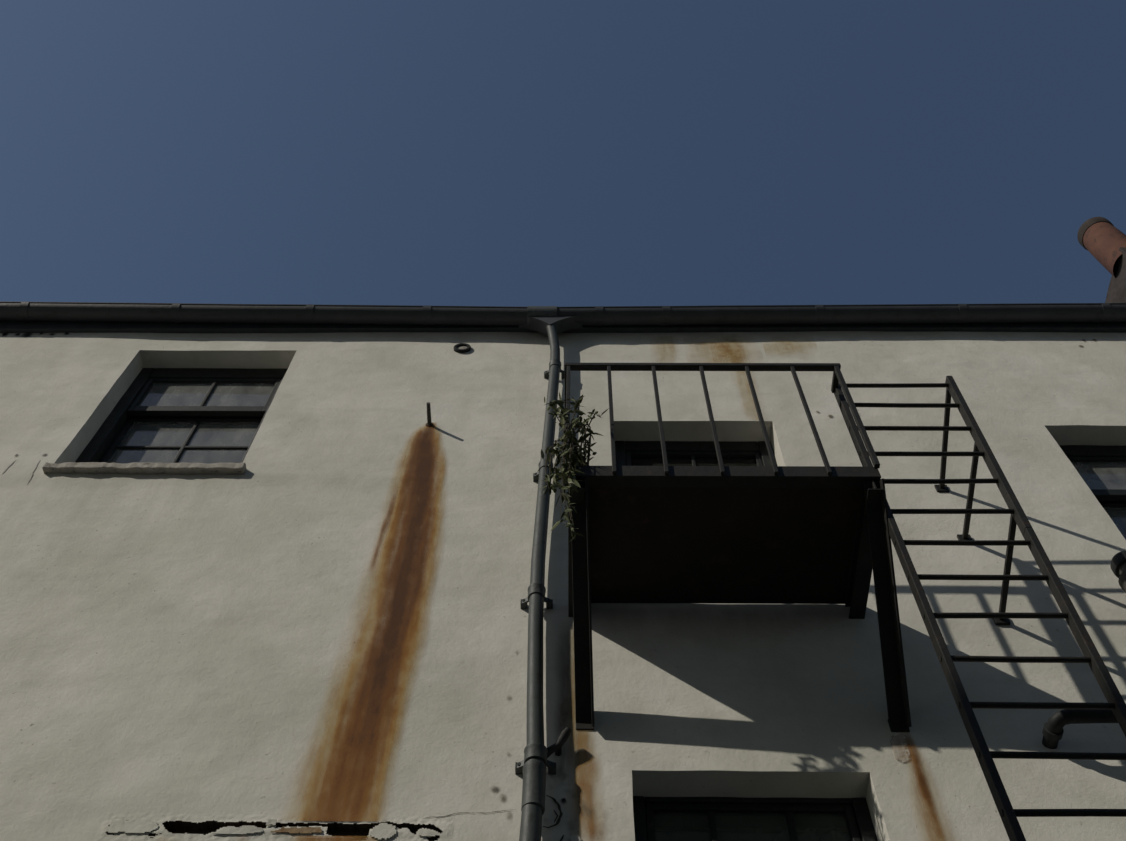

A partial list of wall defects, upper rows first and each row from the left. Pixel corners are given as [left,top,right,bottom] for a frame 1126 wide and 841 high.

rust [298,422,444,821]
crack [94,809,516,841]
rust [576,733,596,838]
rust [906,741,945,841]